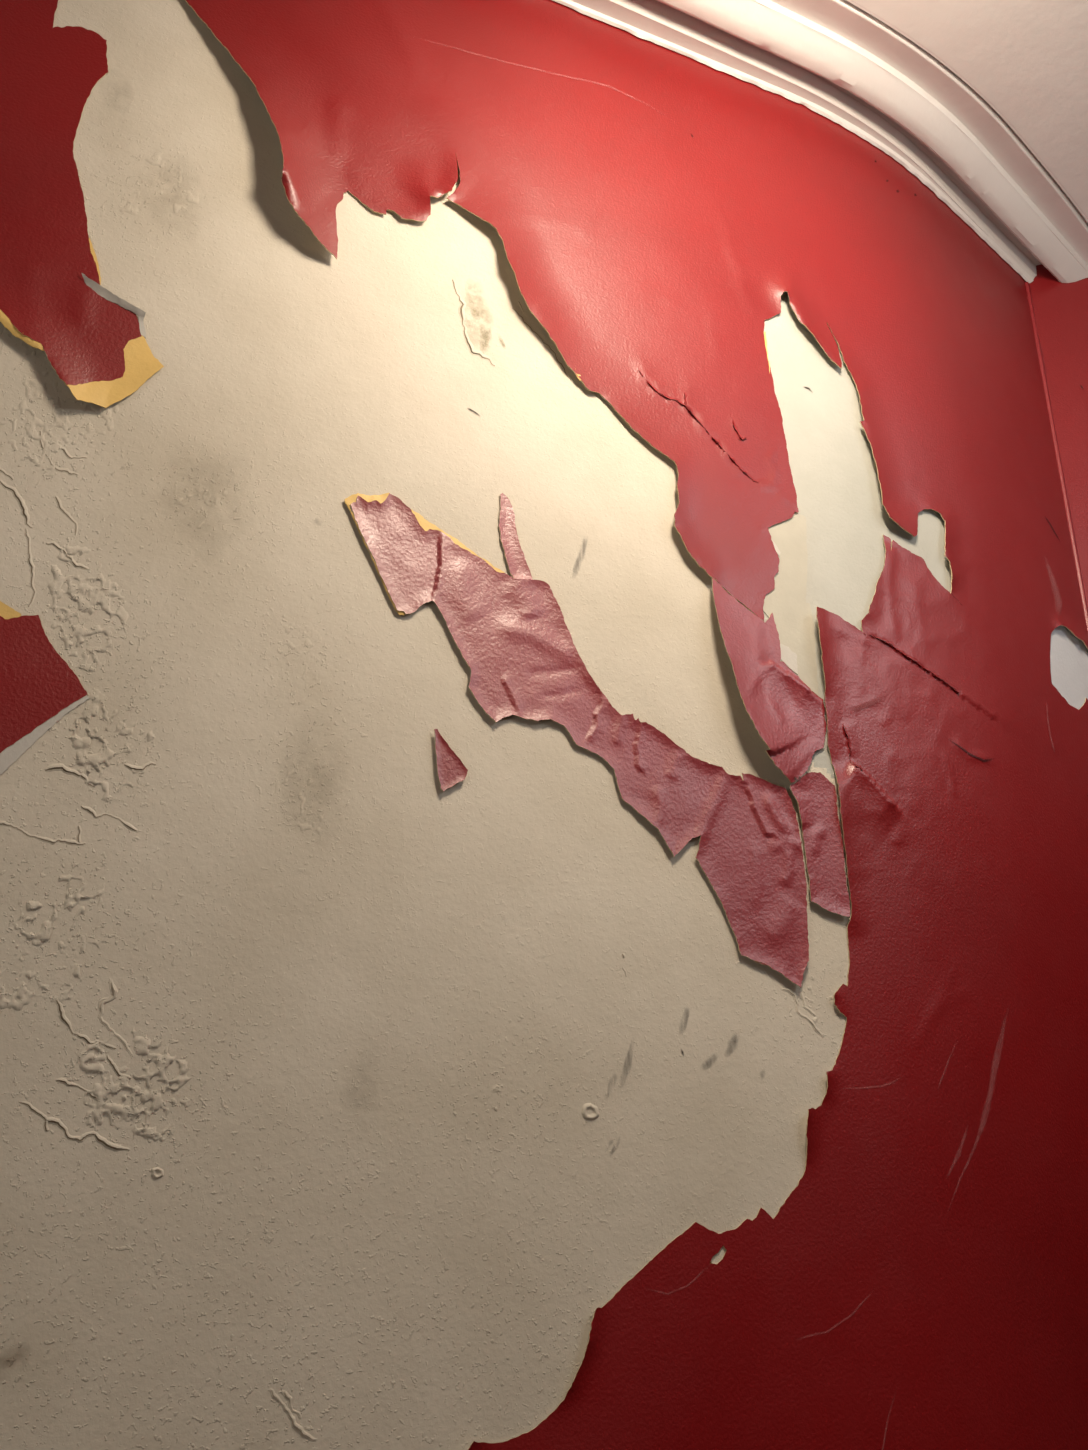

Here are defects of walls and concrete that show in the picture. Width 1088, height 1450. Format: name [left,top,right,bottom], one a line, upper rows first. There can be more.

crack [639,371,759,484]
crack [0,431,90,607]
peeling [763,292,951,779]
crack [864,633,959,693]
peeling [1050,626,1088,710]
crack [0,763,138,846]
crack [124,762,156,772]
peeling [0,0,851,1450]
crack [20,979,133,1152]